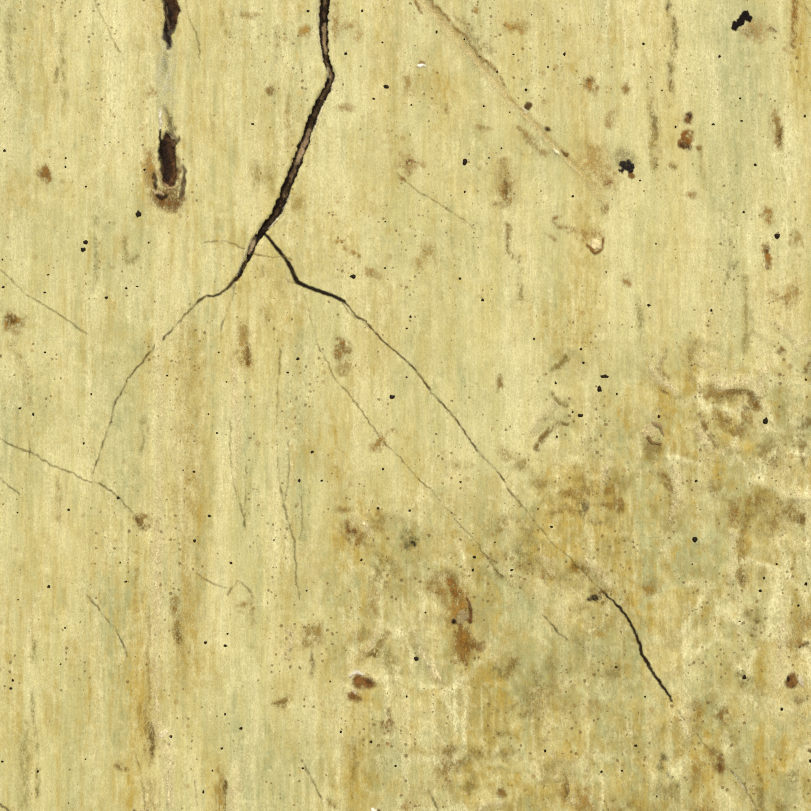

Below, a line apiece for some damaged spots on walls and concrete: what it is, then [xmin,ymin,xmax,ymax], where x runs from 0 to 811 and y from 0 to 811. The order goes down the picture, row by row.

crack [130,0,477,451]
crack [604,593,673,701]